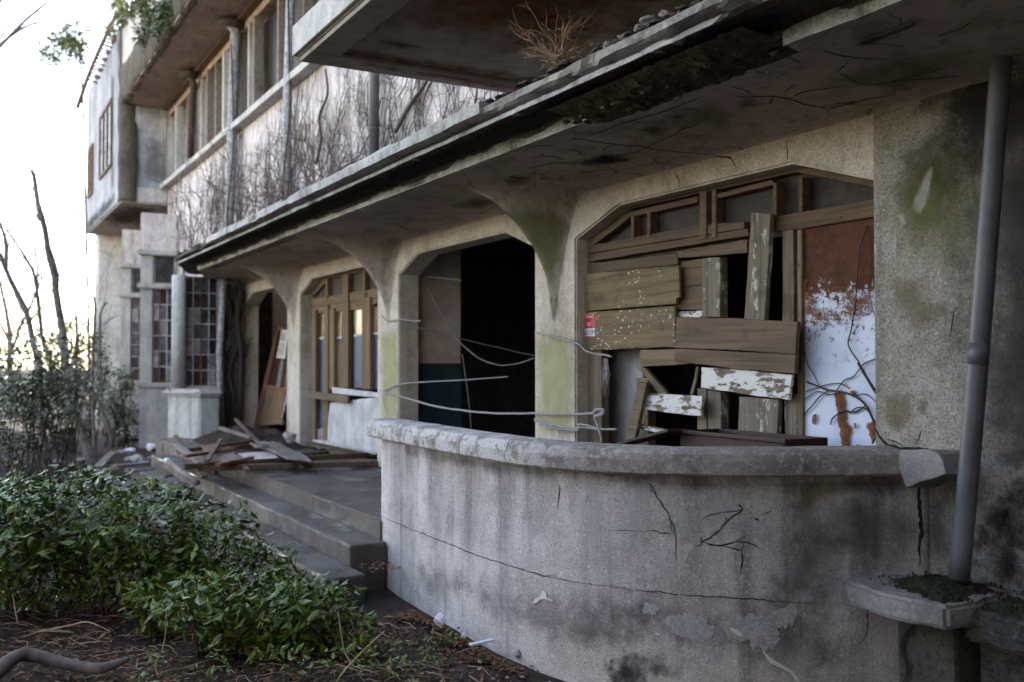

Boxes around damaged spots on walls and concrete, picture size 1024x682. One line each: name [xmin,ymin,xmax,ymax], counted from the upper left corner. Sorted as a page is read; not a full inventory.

spalling [546,26,810,125]
crack [732,42,957,110]
leakage [188,10,800,268]
leakage [907,80,989,209]
leakage [506,211,566,284]
corrosion [795,264,875,335]
corrosion [834,390,876,446]
crack [383,517,801,603]
crack [615,483,773,573]
crack [916,488,924,566]
peeling [643,602,799,664]